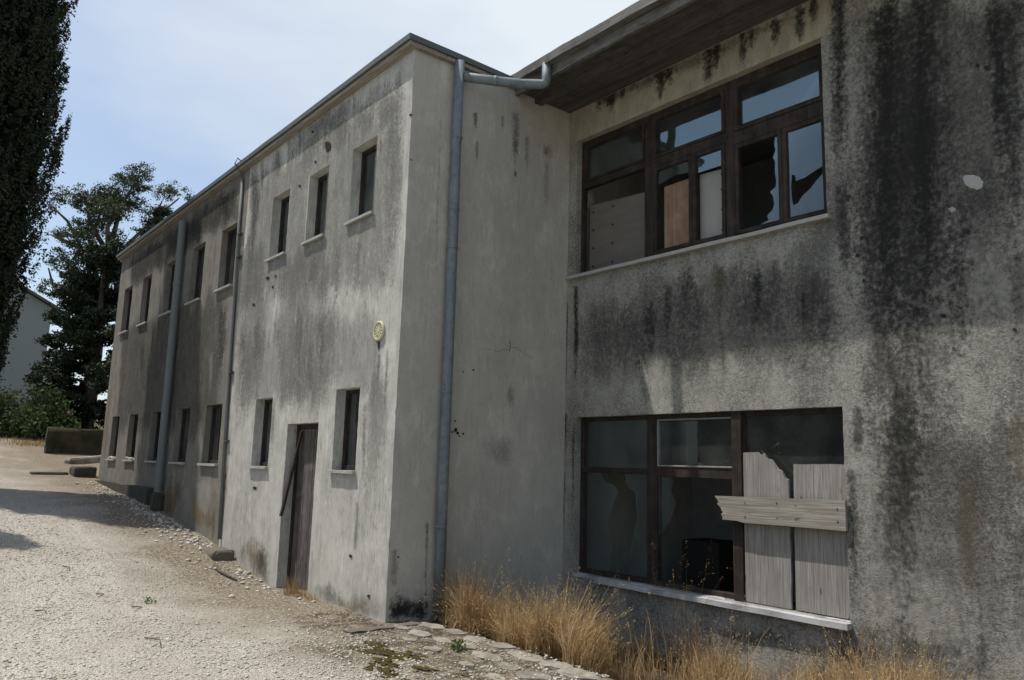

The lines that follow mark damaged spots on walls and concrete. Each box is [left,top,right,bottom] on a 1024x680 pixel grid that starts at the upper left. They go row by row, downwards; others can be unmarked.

water stain [796,0,817,36]
water stain [598,68,682,108]
water stain [705,44,722,80]
water stain [829,0,847,150]
spalling [963,175,983,190]
water stain [131,191,237,284]
water stain [837,3,956,522]
water stain [389,599,427,619]